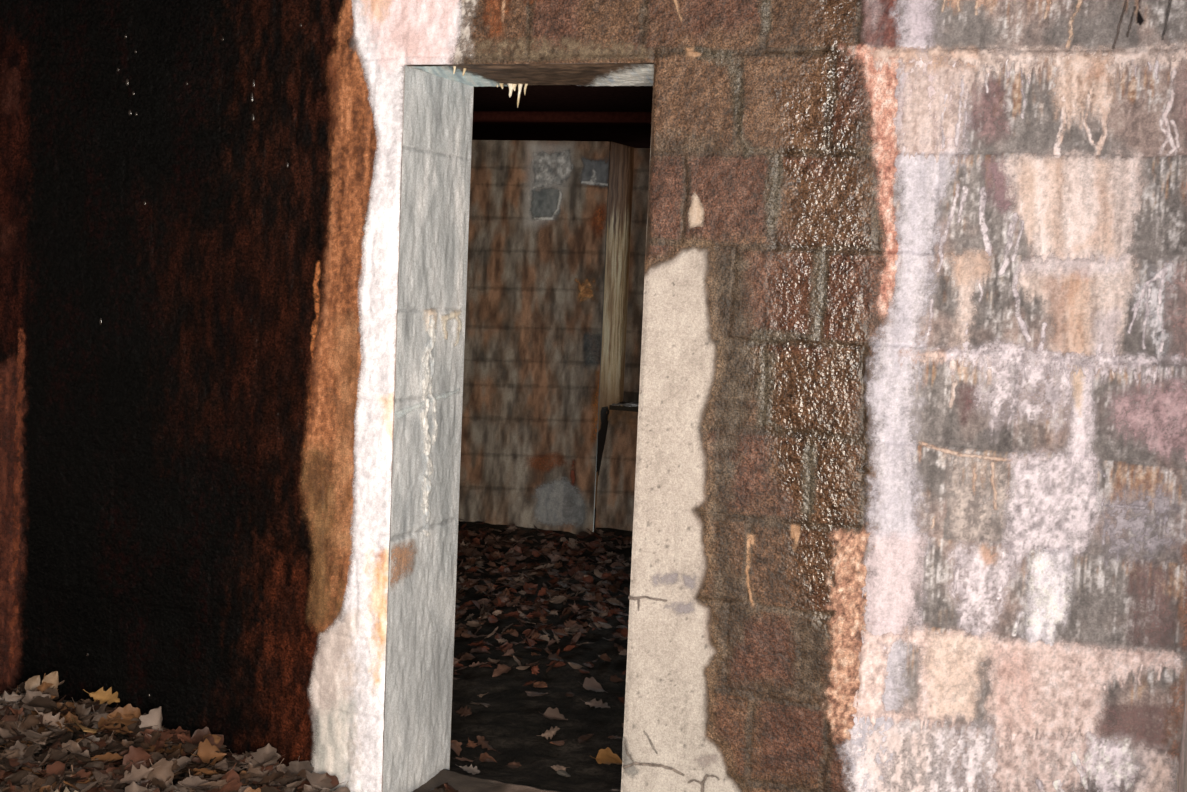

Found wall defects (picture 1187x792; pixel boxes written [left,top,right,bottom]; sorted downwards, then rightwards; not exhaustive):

leakage [871,0,1187,646]
spalling [653,573,695,613]
leakage [848,627,1181,792]
spalling [622,737,638,776]
crack [623,731,719,792]